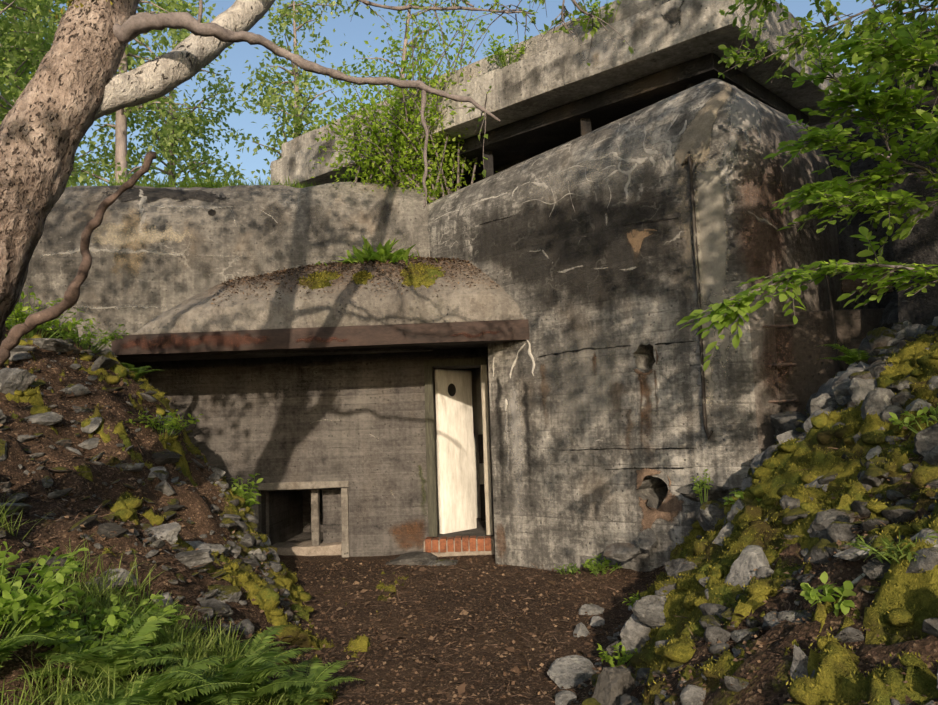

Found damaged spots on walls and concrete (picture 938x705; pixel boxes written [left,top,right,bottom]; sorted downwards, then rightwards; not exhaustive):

crack [434,112,687,226]
leakage [473,194,669,306]
spalling [627,229,657,253]
peeling [674,82,731,404]
leakage [492,357,531,471]
leakage [509,340,535,379]
corrosion [638,371,656,426]
spalling [636,468,684,531]